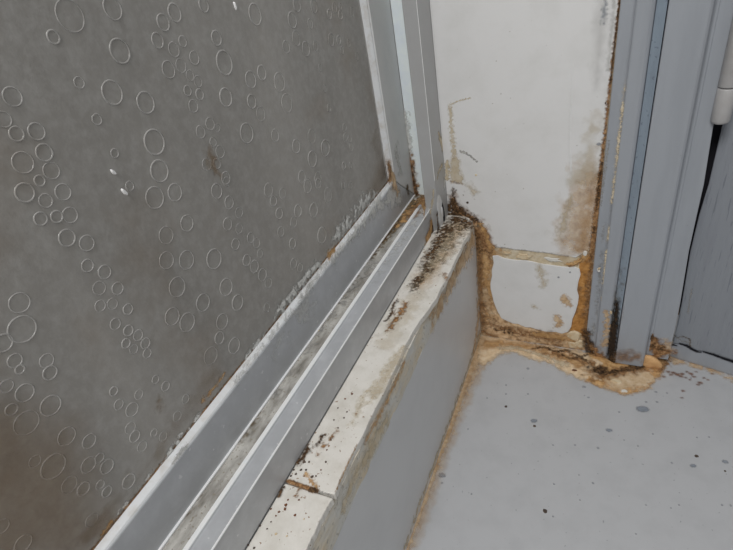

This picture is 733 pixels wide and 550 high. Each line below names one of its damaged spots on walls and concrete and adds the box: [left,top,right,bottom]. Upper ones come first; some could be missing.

leakage [445,98,478,183]
leakage [335,360,405,512]
leakage [404,232,603,550]